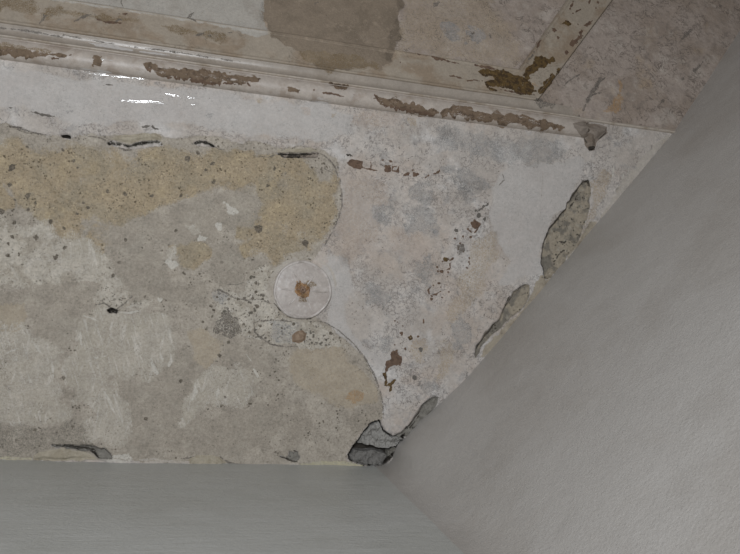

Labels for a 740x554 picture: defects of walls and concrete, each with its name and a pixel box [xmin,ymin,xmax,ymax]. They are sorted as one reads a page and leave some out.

peeling [552,1,593,55]
peeling [0,42,72,60]
peeling [143,62,261,87]
peeling [449,40,561,95]
peeling [373,94,565,131]
crack [88,136,162,151]
crack [194,140,224,150]
flaking render [475,180,598,358]
flaking render [0,123,440,465]
corrosion [294,280,317,303]